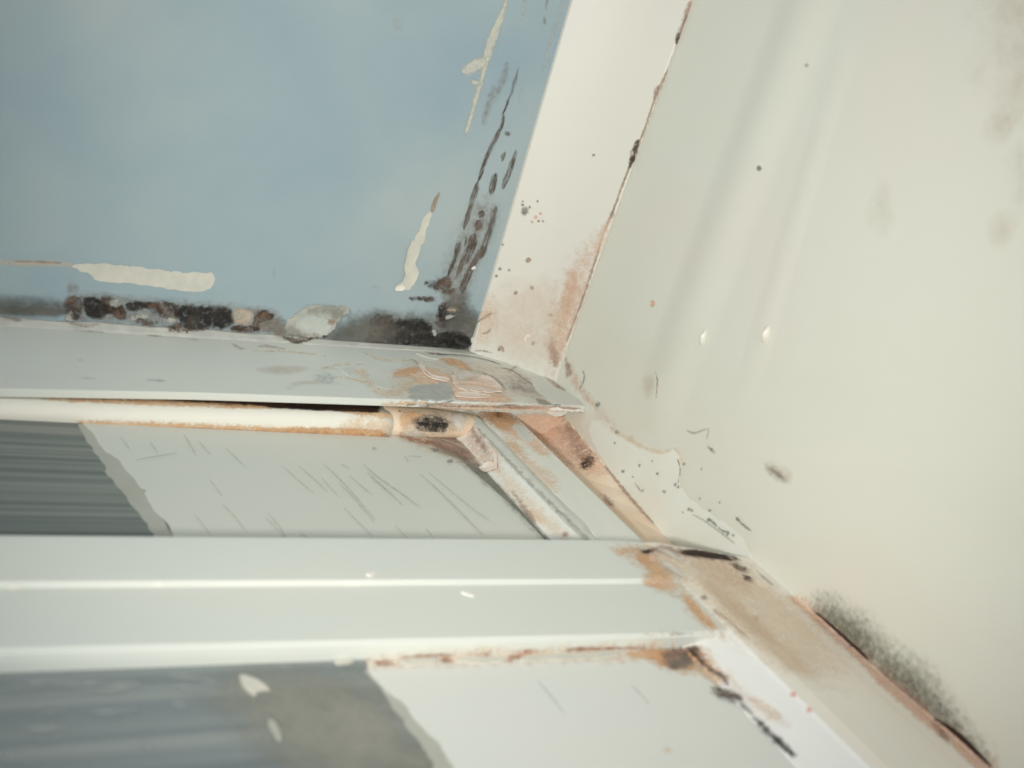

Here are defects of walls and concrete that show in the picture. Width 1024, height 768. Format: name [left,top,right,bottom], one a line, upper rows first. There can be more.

peeling [462,0,507,134]
peeling [17,261,215,292]
damp [51,98,516,432]
peeling [395,194,440,291]
damp [0,296,257,332]
peeling [284,304,349,344]
corrosion [80,420,389,437]
corrosion [480,411,552,487]
corrosion [616,546,677,591]
corrosion [567,647,663,661]
peeling [240,674,270,696]
damp [815,608,991,768]